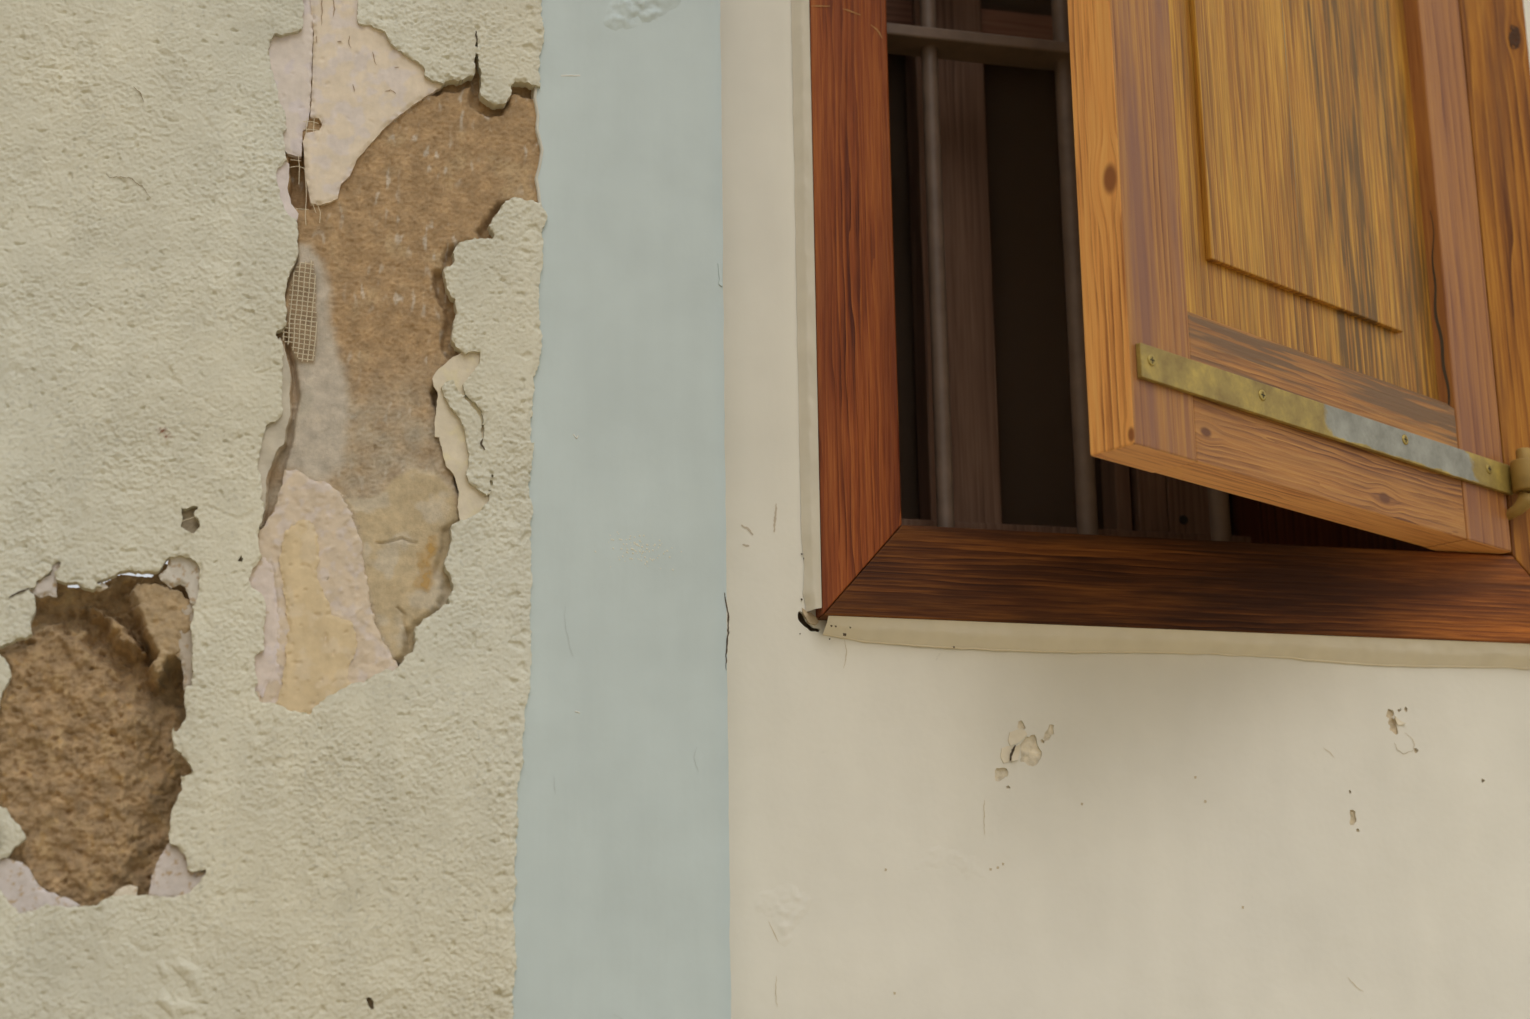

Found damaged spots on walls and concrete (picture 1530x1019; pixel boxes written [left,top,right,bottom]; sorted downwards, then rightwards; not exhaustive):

peeling [238,0,544,714]
spalling [0,557,206,913]
flaking render [995,721,1053,789]